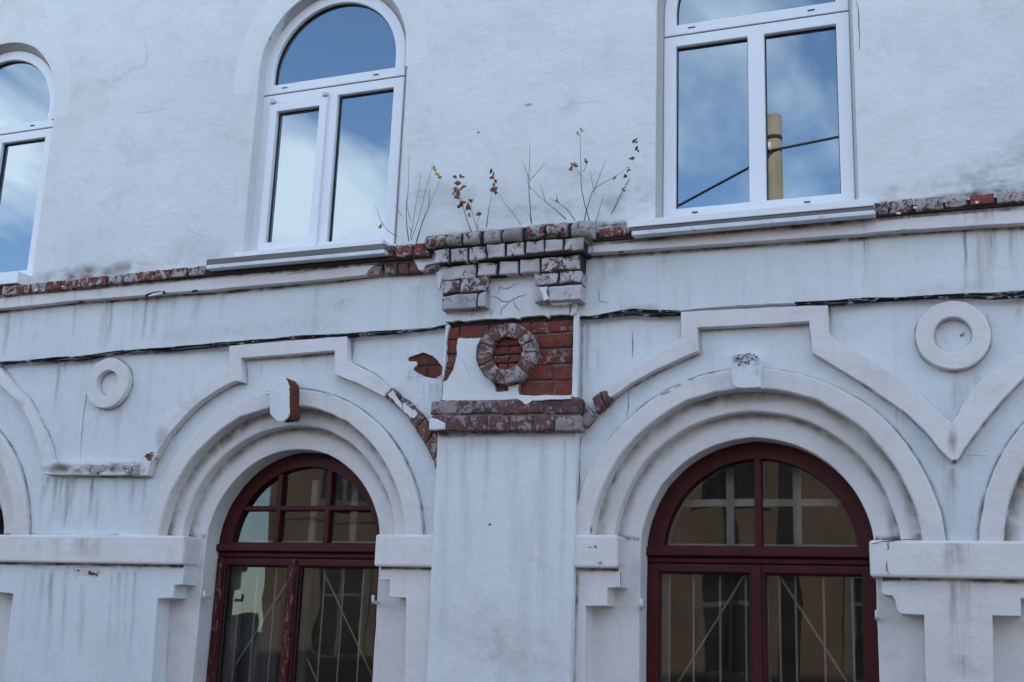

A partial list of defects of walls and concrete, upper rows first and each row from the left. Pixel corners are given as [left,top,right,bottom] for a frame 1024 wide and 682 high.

flaking render [409,320,573,402]
flaking render [386,389,438,467]
flaking render [582,391,614,428]